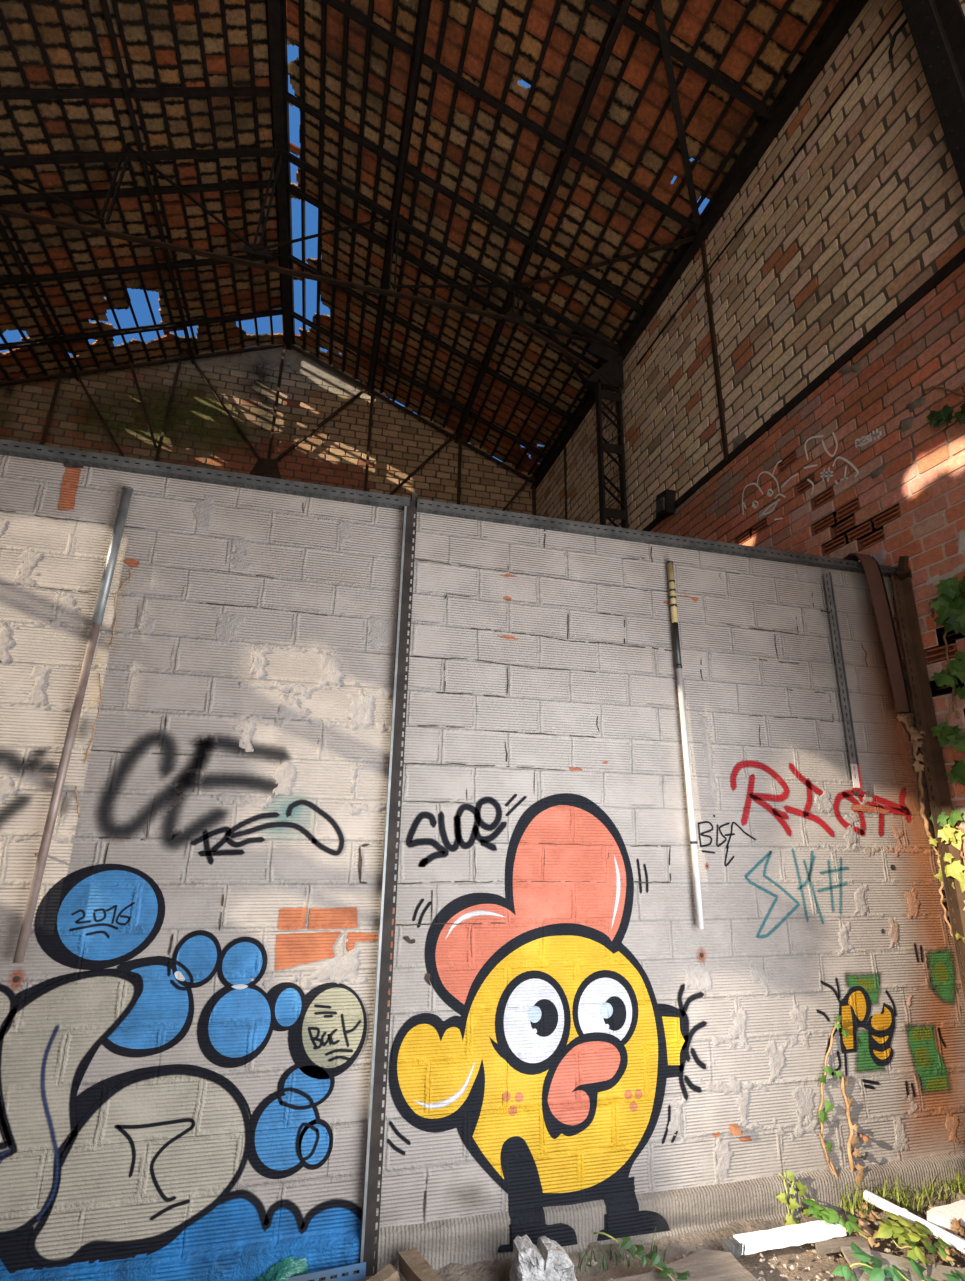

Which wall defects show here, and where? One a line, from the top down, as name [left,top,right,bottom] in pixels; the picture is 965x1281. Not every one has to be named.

peeling [275,907,415,1018]